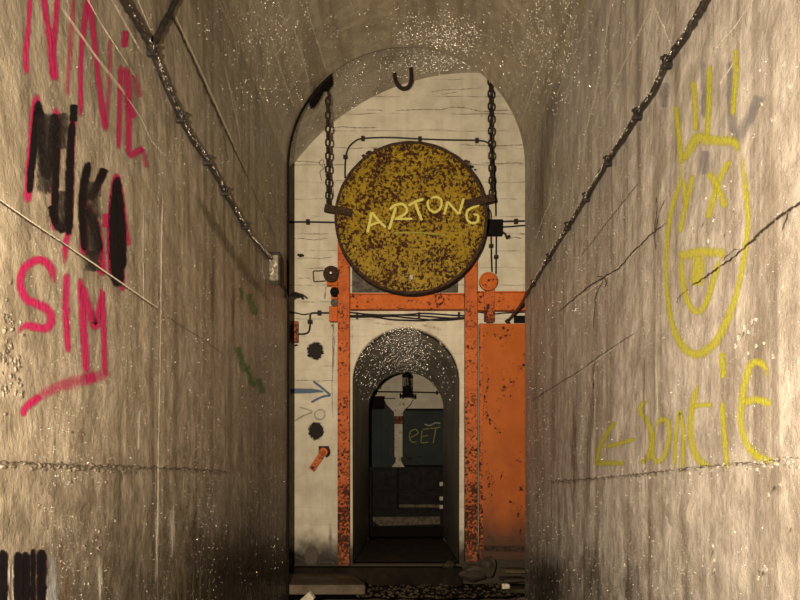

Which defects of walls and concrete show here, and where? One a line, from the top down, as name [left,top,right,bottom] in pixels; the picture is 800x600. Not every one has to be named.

crack [558,200,665,327]
crack [677,202,800,300]